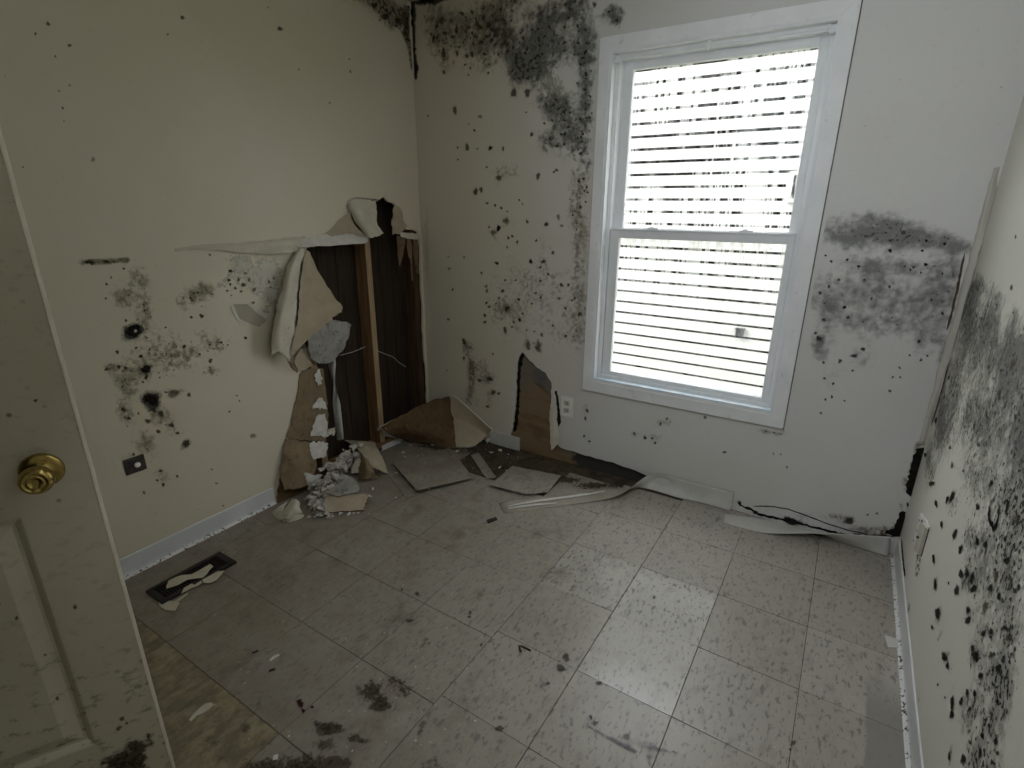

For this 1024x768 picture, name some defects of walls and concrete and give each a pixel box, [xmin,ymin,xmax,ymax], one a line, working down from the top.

damp [359,0,623,166]
mould [82,258,229,456]
hole [326,244,371,460]
damp [462,339,500,408]
damp [483,178,588,349]
flaking render [510,351,561,432]
mould [818,214,966,343]
crack [738,501,894,537]
mould [926,281,1024,768]